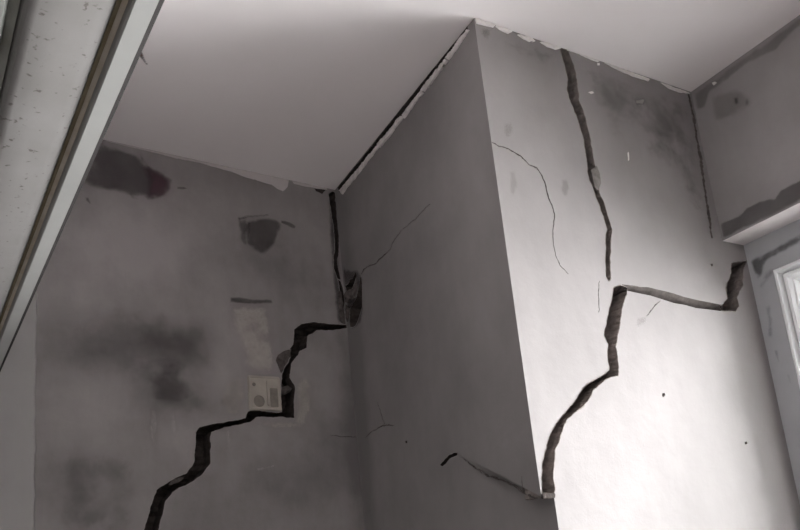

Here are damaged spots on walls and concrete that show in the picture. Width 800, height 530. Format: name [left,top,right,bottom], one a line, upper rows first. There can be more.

damp [88,150,169,196]
damp [248,220,279,251]
crack [143,18,747,530]